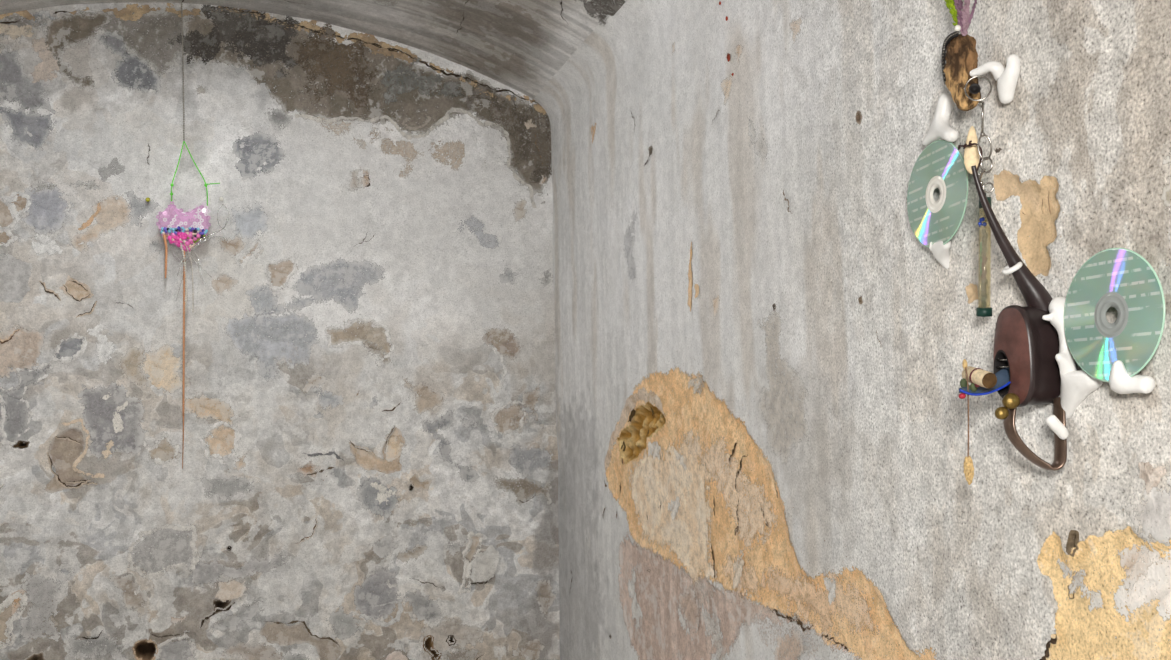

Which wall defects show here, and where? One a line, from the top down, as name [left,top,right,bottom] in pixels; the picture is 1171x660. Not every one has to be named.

damp [0,4,552,208]
spalling [993,163,1064,279]
peeling [42,418,105,493]
spalling [297,428,432,492]
peeling [604,361,942,660]
peeling [0,589,28,649]
spalling [24,651,46,660]
peeling [1035,526,1171,660]